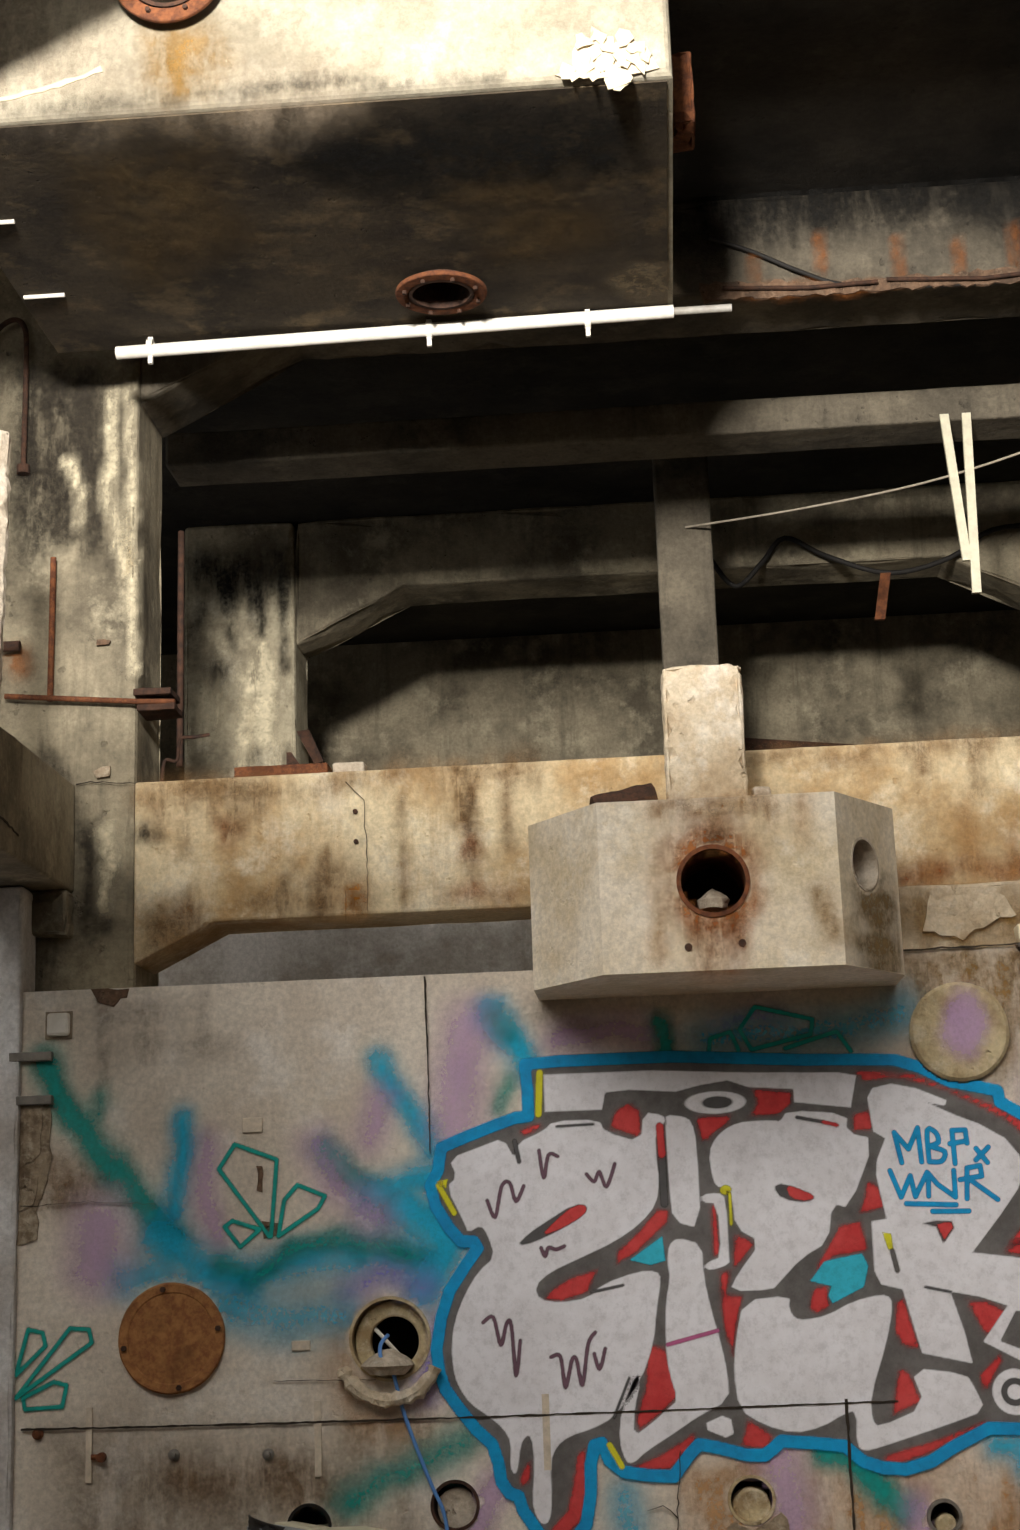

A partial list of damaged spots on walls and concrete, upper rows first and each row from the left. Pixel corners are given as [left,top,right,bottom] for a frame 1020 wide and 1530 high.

corrosion [154,34,215,88]
corrosion [204,763,332,838]
corrosion [656,796,756,870]
corrosion [677,888,758,934]